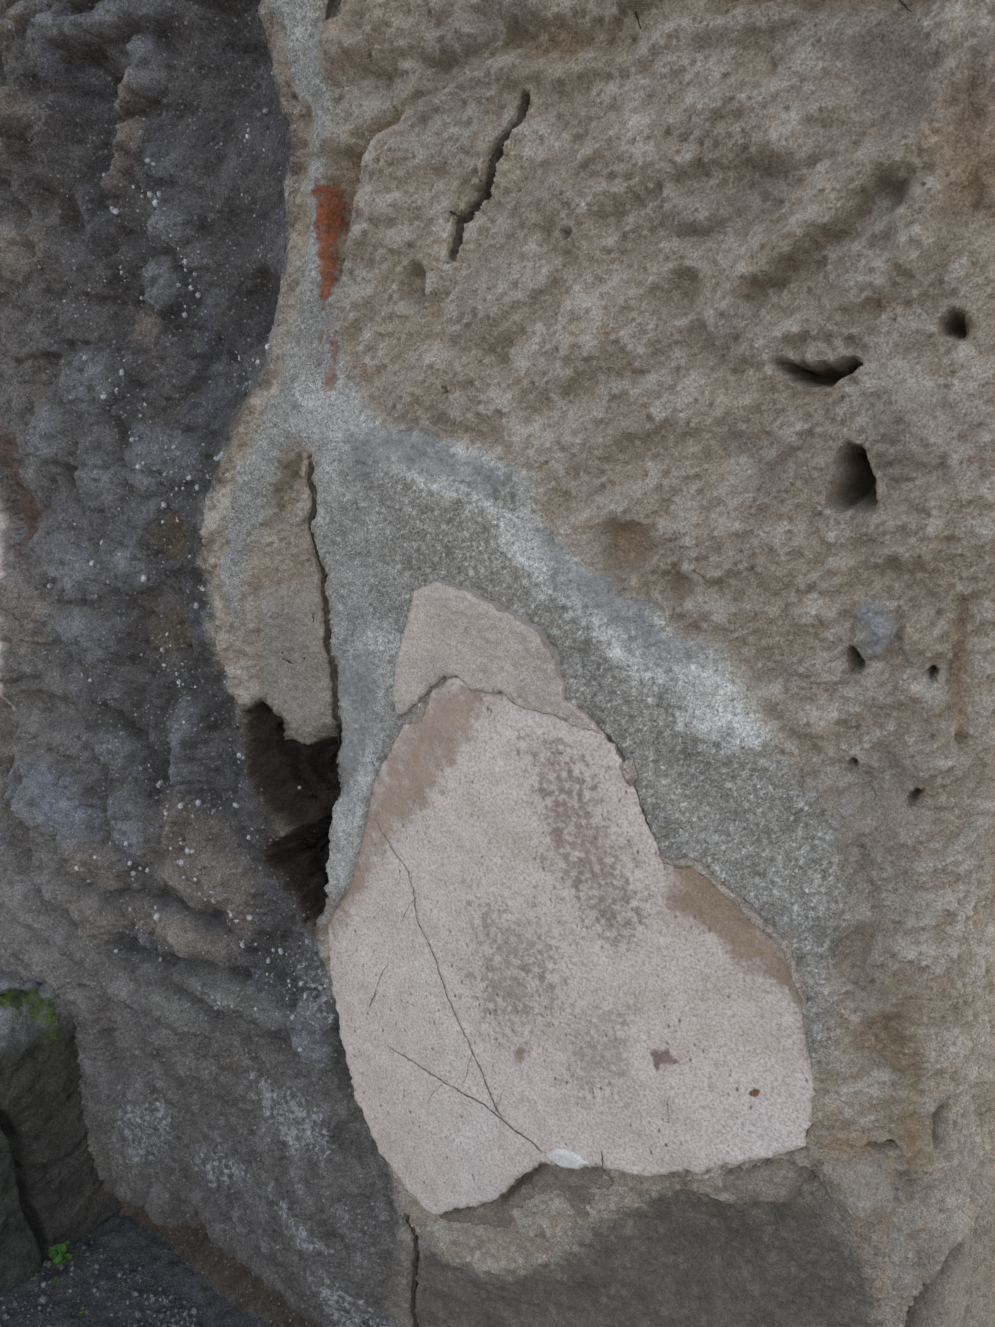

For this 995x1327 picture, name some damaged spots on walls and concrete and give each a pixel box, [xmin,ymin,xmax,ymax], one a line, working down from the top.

crack [449,99,525,257]
crack [281,460,340,746]
spalling [218,0,859,1076]
crack [375,820,541,1152]
crack [406,1218,426,1327]